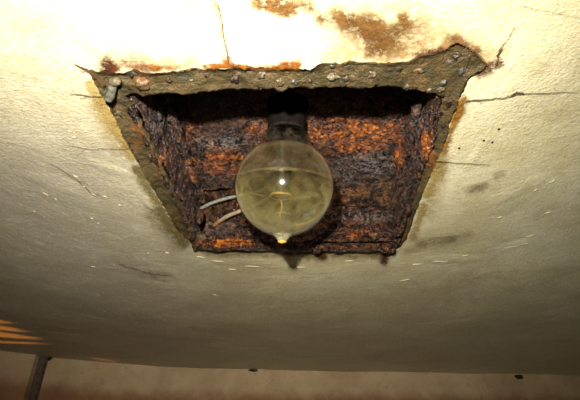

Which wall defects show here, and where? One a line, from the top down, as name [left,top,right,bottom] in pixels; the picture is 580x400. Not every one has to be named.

rust [252,0,310,17]
crack [213,0,234,66]
rust [318,8,420,58]
rust [416,35,482,56]
rust [101,58,119,73]
rust [203,58,301,70]
crack [465,92,574,103]
spalling [89,43,487,249]